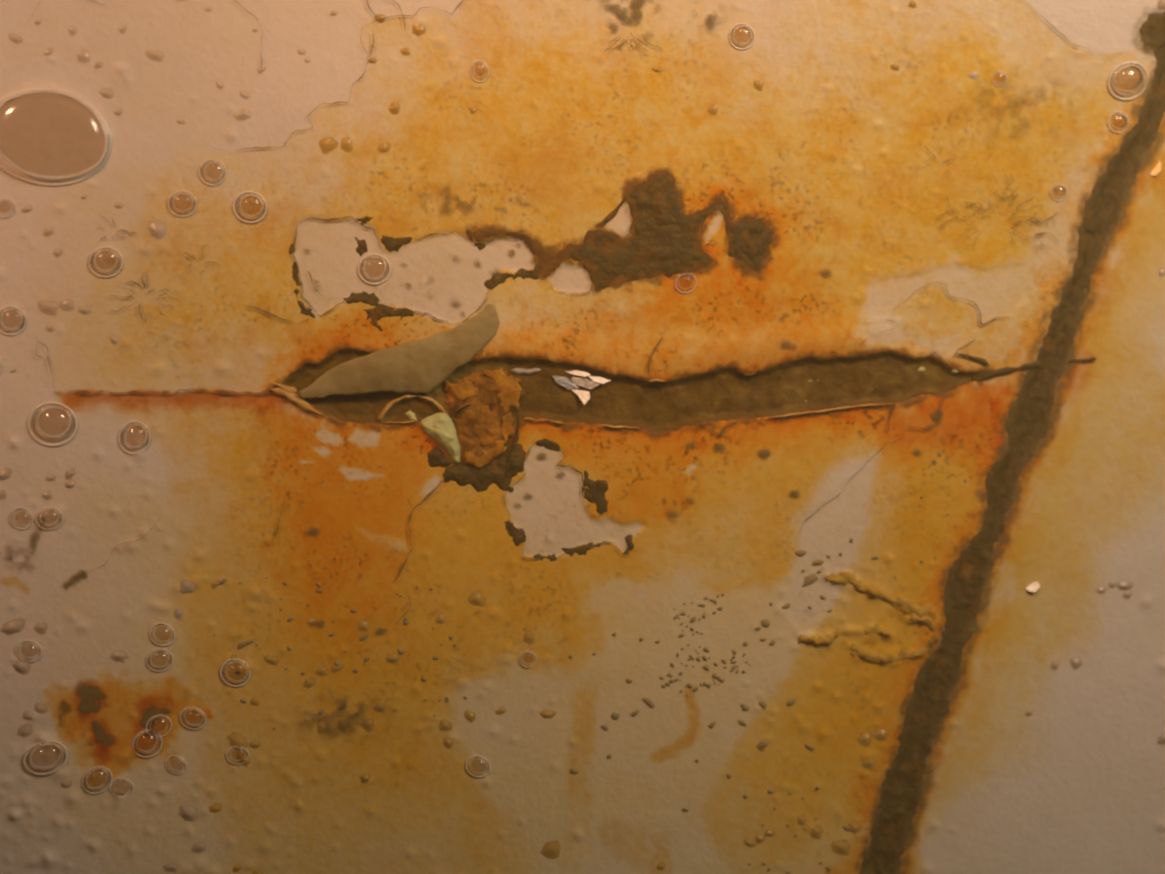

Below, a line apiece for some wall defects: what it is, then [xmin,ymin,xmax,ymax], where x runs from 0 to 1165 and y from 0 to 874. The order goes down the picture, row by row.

peeling [289,216,594,332]
rust [468,168,778,292]
peeling [377,393,460,467]
rust [442,341,990,492]
peeling [504,438,639,562]
rust [64,571,87,589]
rust [60,683,114,745]